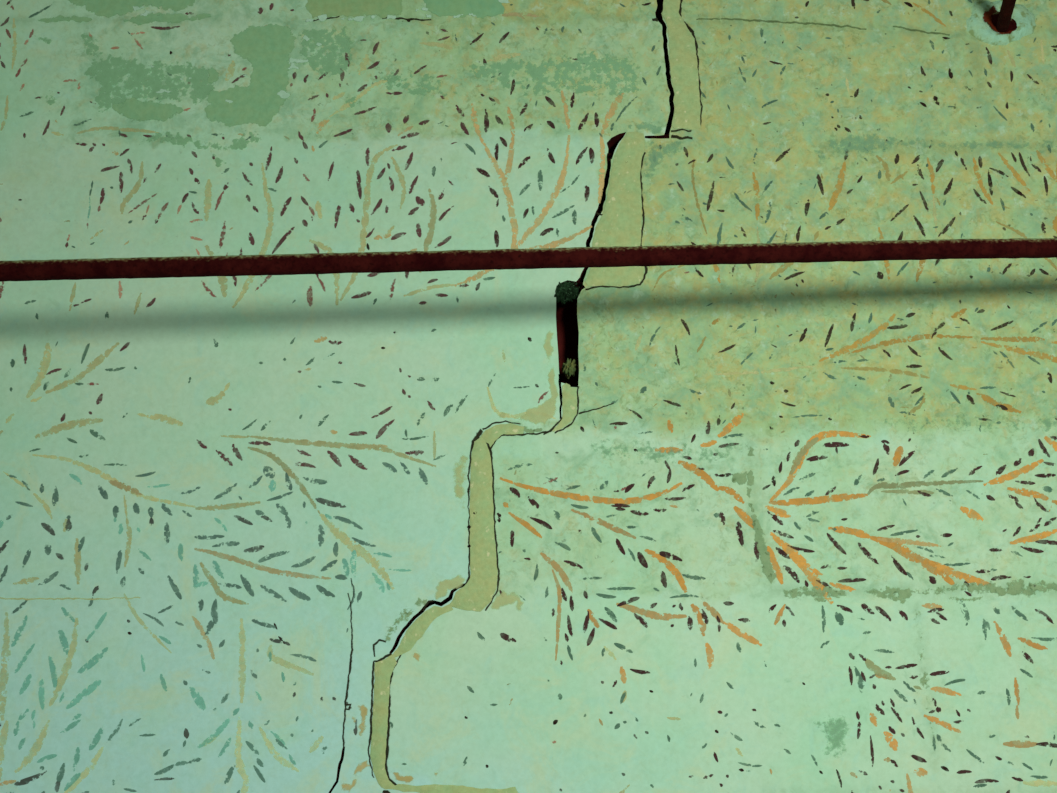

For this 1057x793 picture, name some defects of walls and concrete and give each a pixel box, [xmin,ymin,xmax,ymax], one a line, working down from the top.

flaking render [416,0,509,18]
crack [893,26,950,36]
rust [983,6,1015,34]
flaking render [38,0,402,167]
flaking render [469,51,641,96]
crack [329,0,866,793]